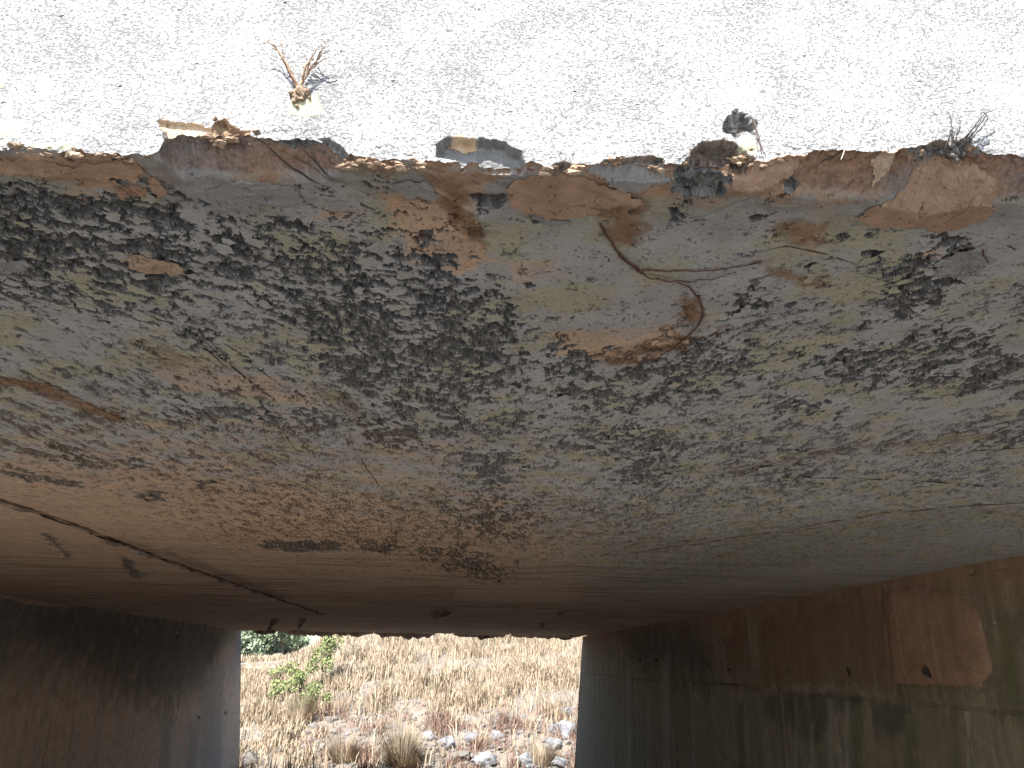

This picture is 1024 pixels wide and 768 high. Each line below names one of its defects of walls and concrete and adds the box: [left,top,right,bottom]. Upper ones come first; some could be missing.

spalling [2,142,52,158]
spalling [65,147,153,164]
spalling [157,116,585,176]
spalling [599,108,785,219]
spalling [905,138,991,162]
peeling [0,175,1024,584]